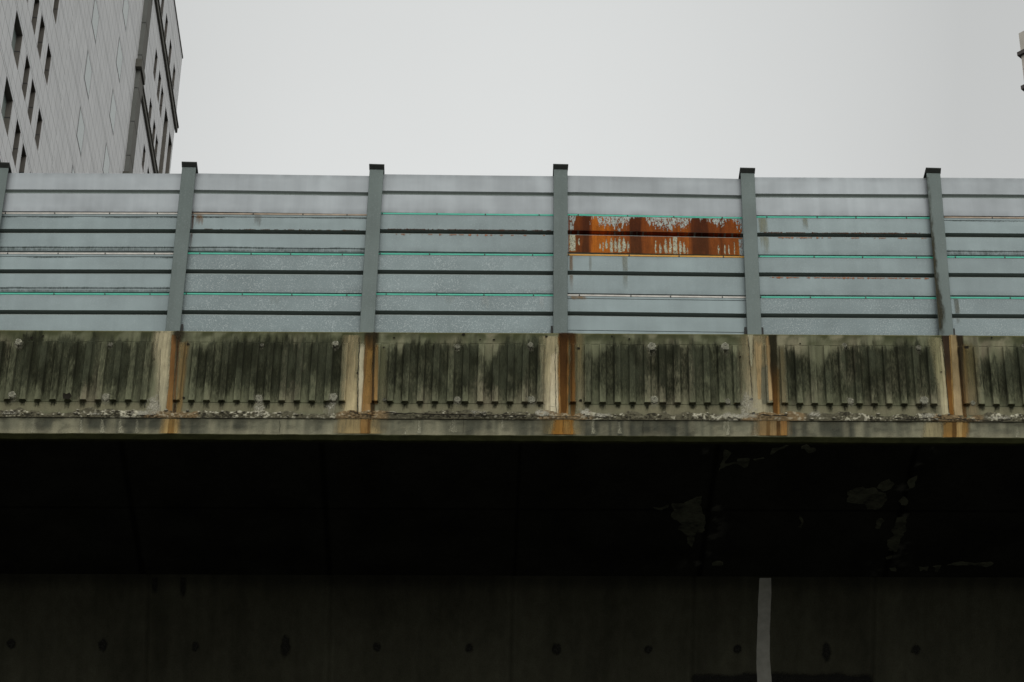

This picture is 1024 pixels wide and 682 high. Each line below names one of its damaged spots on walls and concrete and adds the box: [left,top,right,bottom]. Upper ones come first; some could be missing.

corrosion [568,216,743,264]
damp [0,331,160,433]
corrosion [156,331,188,433]
damp [189,334,344,414]
corrosion [339,332,386,434]
damp [386,337,549,417]
corrosion [544,333,584,434]
damp [581,340,757,436]
corrosion [745,335,787,436]
damp [784,339,939,418]
corrosion [923,335,977,437]
damp [974,345,1024,419]